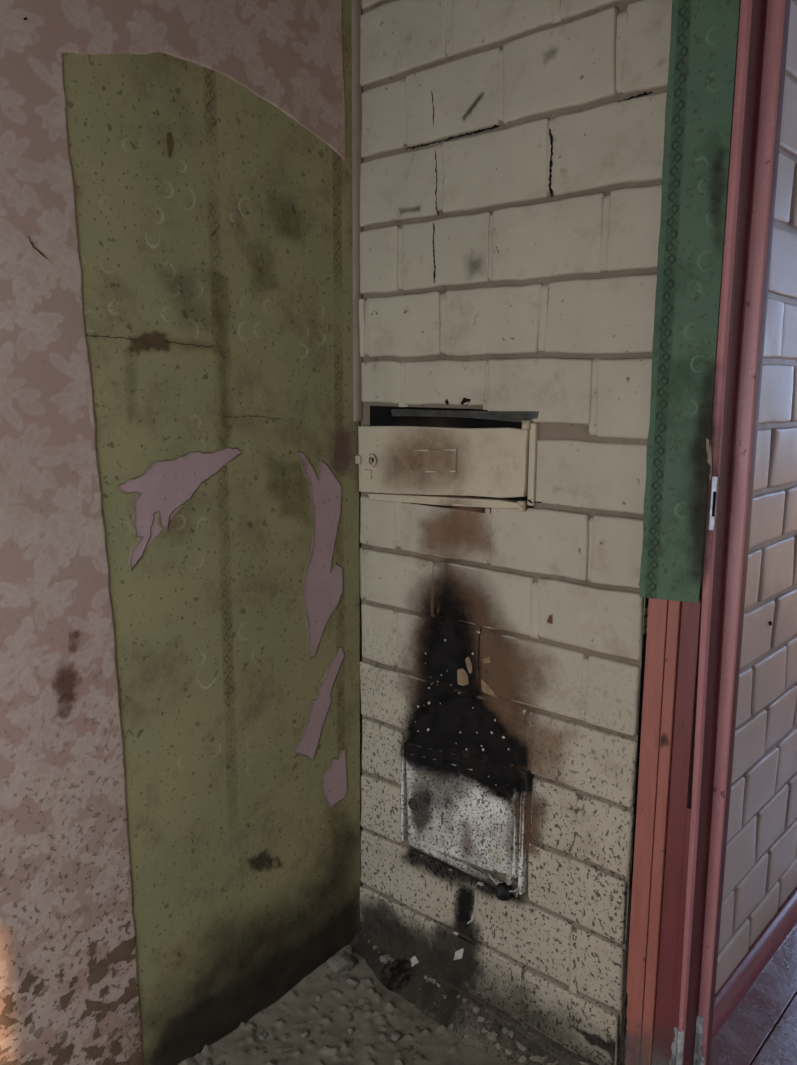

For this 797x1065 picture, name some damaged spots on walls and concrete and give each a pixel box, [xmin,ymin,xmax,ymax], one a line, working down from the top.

crack [546,128,554,198]